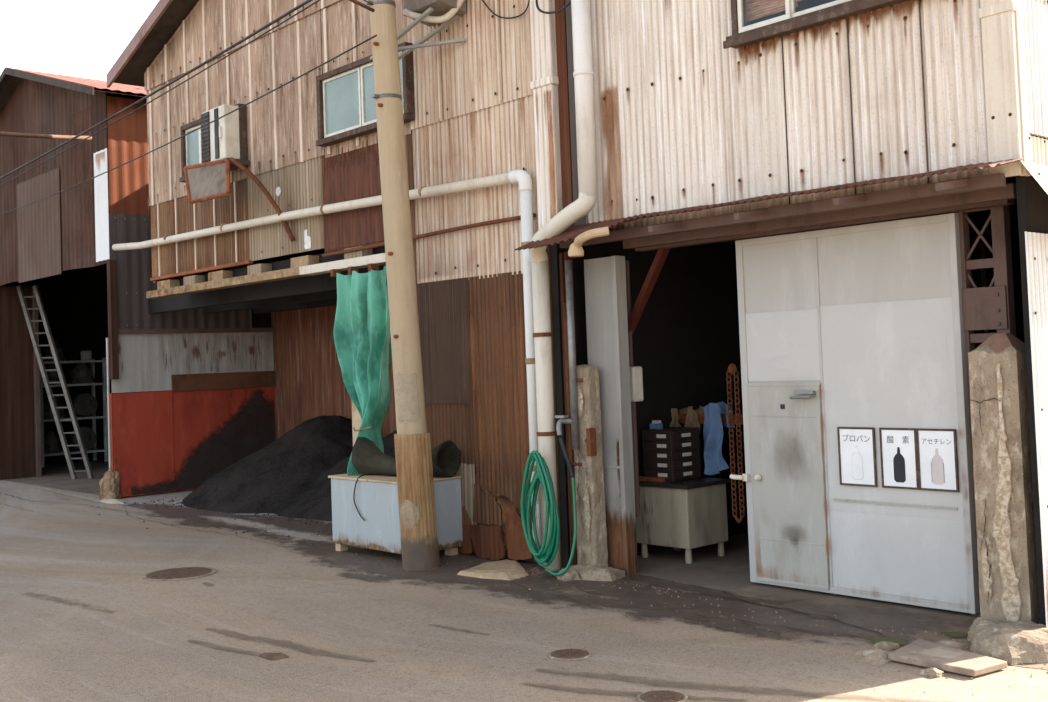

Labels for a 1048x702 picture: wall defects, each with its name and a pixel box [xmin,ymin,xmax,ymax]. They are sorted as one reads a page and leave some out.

corrosion [601,89,629,230]
crack [969,398,998,435]
corrosion [458,482,535,560]
crack [980,499,991,596]